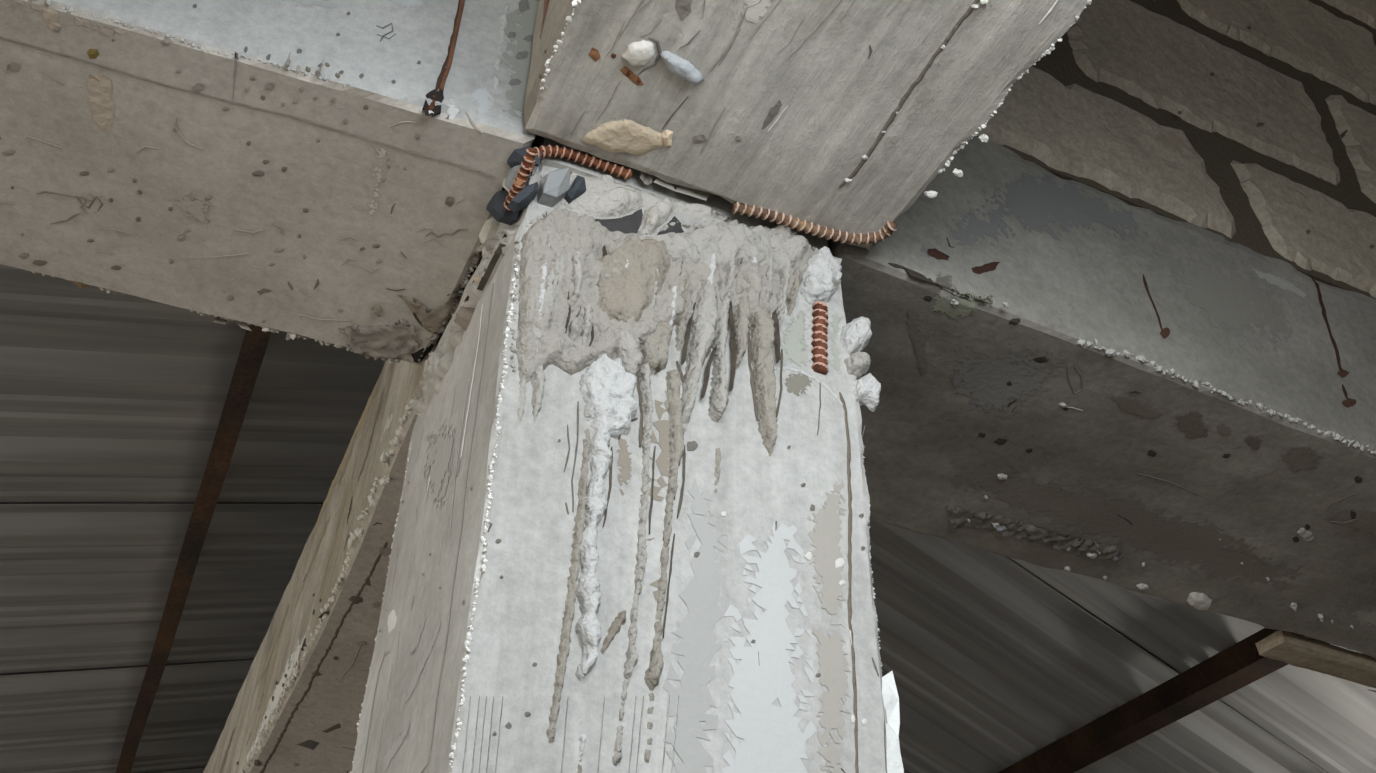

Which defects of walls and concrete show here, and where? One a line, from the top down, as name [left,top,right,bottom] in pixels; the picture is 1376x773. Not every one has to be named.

leakage [245,382,397,763]
spalling [262,119,897,773]
leakage [1110,395,1263,450]